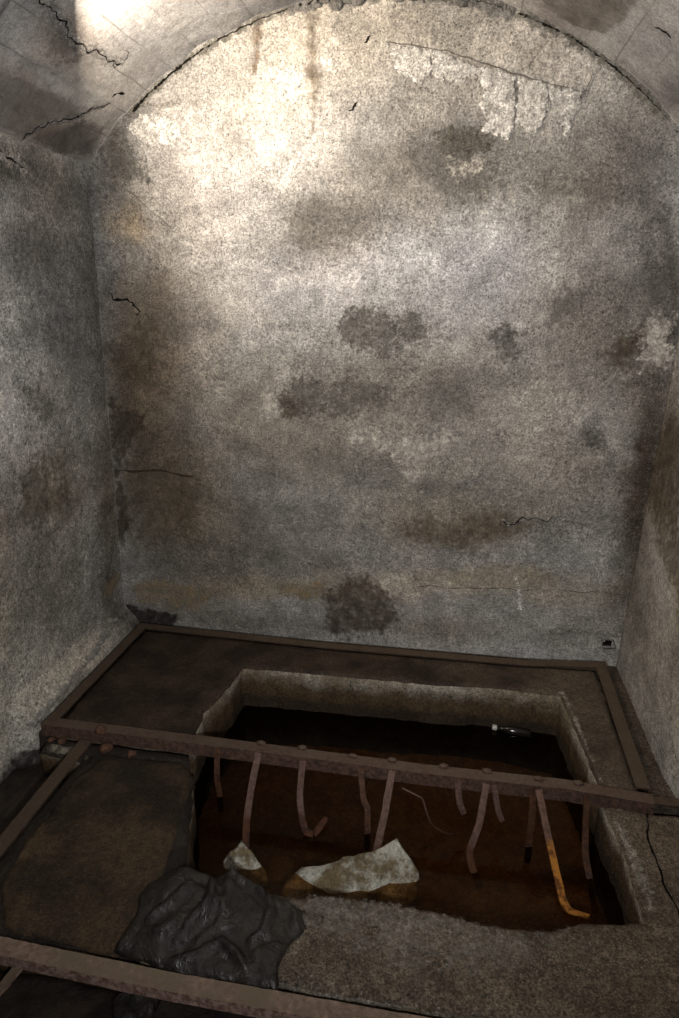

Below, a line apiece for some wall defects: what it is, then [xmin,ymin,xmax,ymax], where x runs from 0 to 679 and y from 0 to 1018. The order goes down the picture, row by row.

crack [0,0,332,180]
crack [364,0,670,119]
leakage [337,306,426,358]
leakage [603,267,678,375]
crack [118,469,194,477]
leakage [256,377,478,483]
crack [501,515,589,527]
leakage [324,577,399,641]
crack [646,813,679,915]